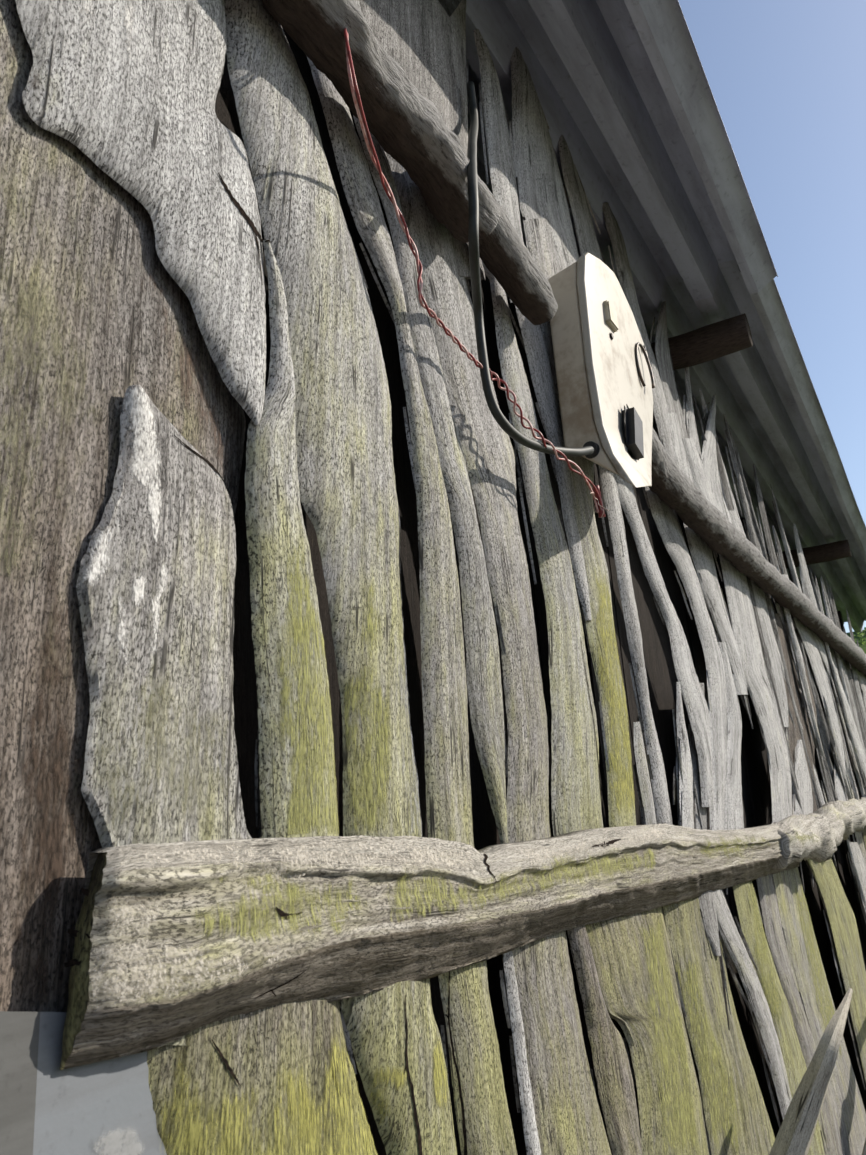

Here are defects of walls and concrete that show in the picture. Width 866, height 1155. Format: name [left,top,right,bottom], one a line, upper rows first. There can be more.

crack [484,854,497,889]
crack [212,1040,240,1085]